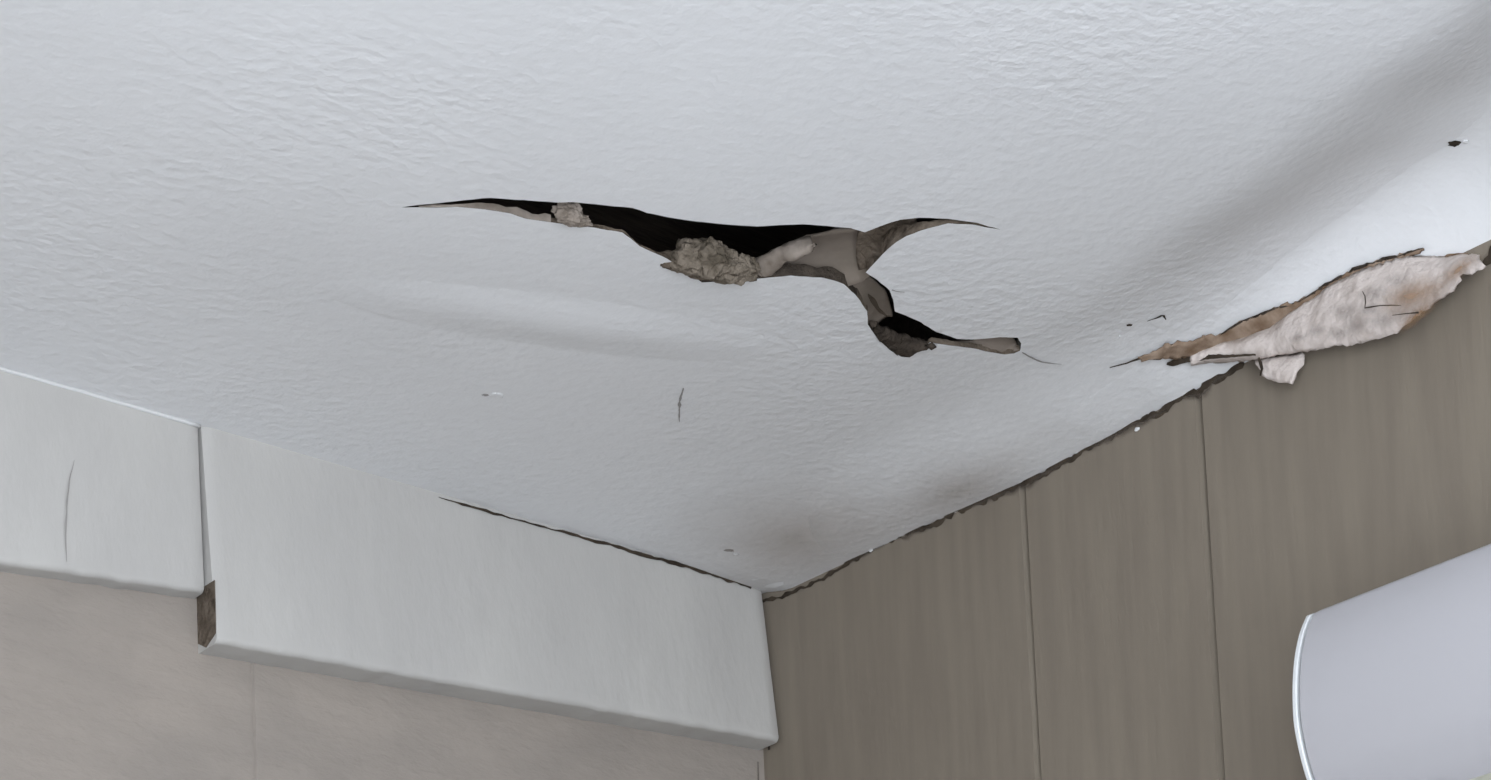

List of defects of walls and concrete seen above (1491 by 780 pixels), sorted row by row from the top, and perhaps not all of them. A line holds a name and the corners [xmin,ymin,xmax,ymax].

crack [407,198,1062,365]
flaking render [1110,248,1486,384]